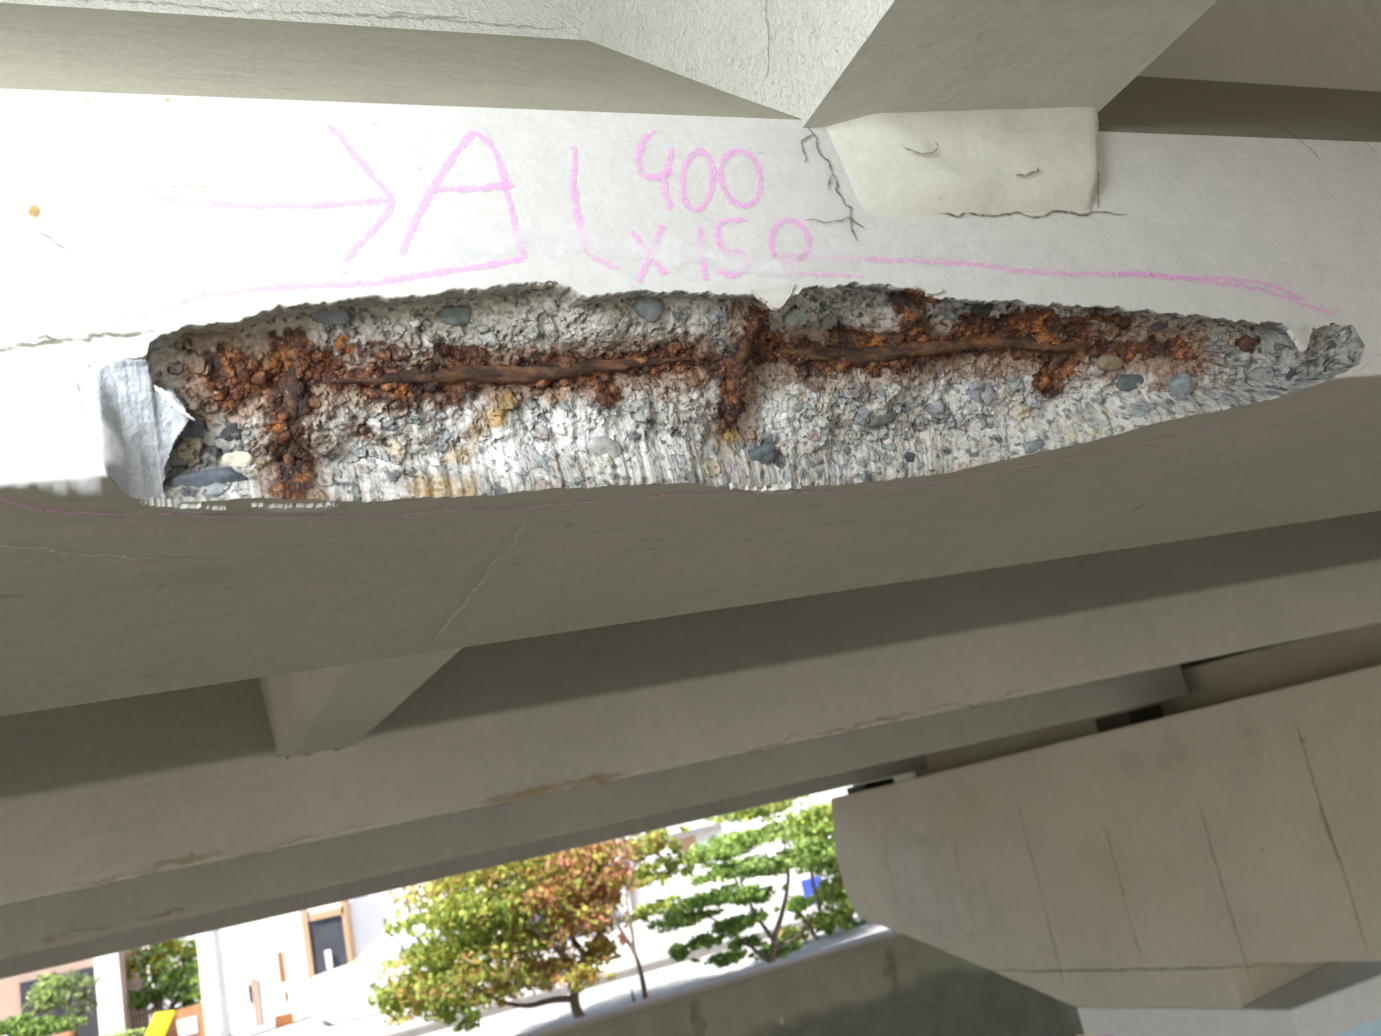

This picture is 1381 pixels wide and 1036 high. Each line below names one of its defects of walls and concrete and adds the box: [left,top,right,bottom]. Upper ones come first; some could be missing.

crack [906,142,938,155]
crack [800,119,863,242]
crack [944,172,1127,218]
crack [0,330,155,351]
spalling [76,281,1365,514]